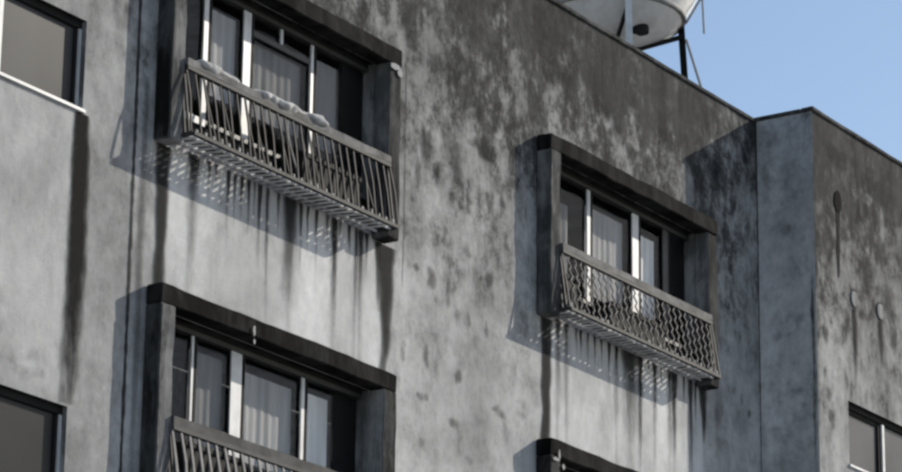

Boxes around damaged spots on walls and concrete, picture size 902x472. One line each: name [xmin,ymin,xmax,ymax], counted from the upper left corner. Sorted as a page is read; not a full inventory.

leakage [64,111,90,390]
leakage [189,152,395,370]
leakage [541,317,706,439]